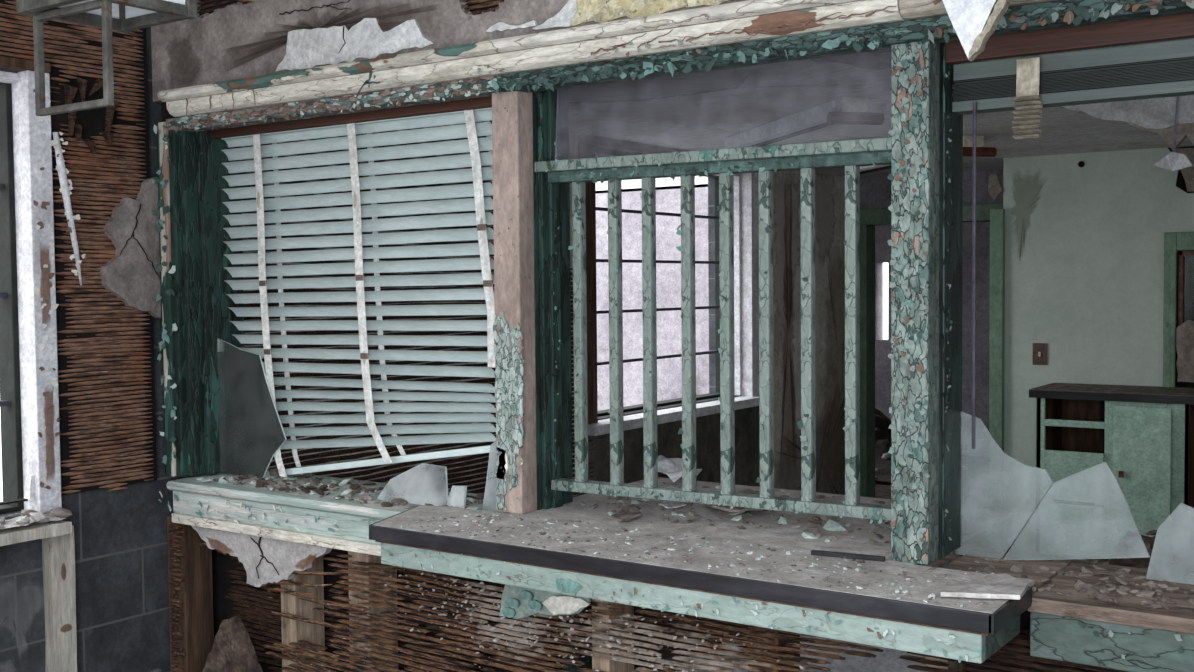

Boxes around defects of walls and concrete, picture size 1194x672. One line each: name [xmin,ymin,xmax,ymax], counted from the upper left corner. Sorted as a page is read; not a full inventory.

flaking render [460,0,578,33]
crack [120,204,160,278]
flaking render [152,18,957,545]
crack [250,537,279,579]
peeling [455,554,591,619]
peeling [603,581,719,617]